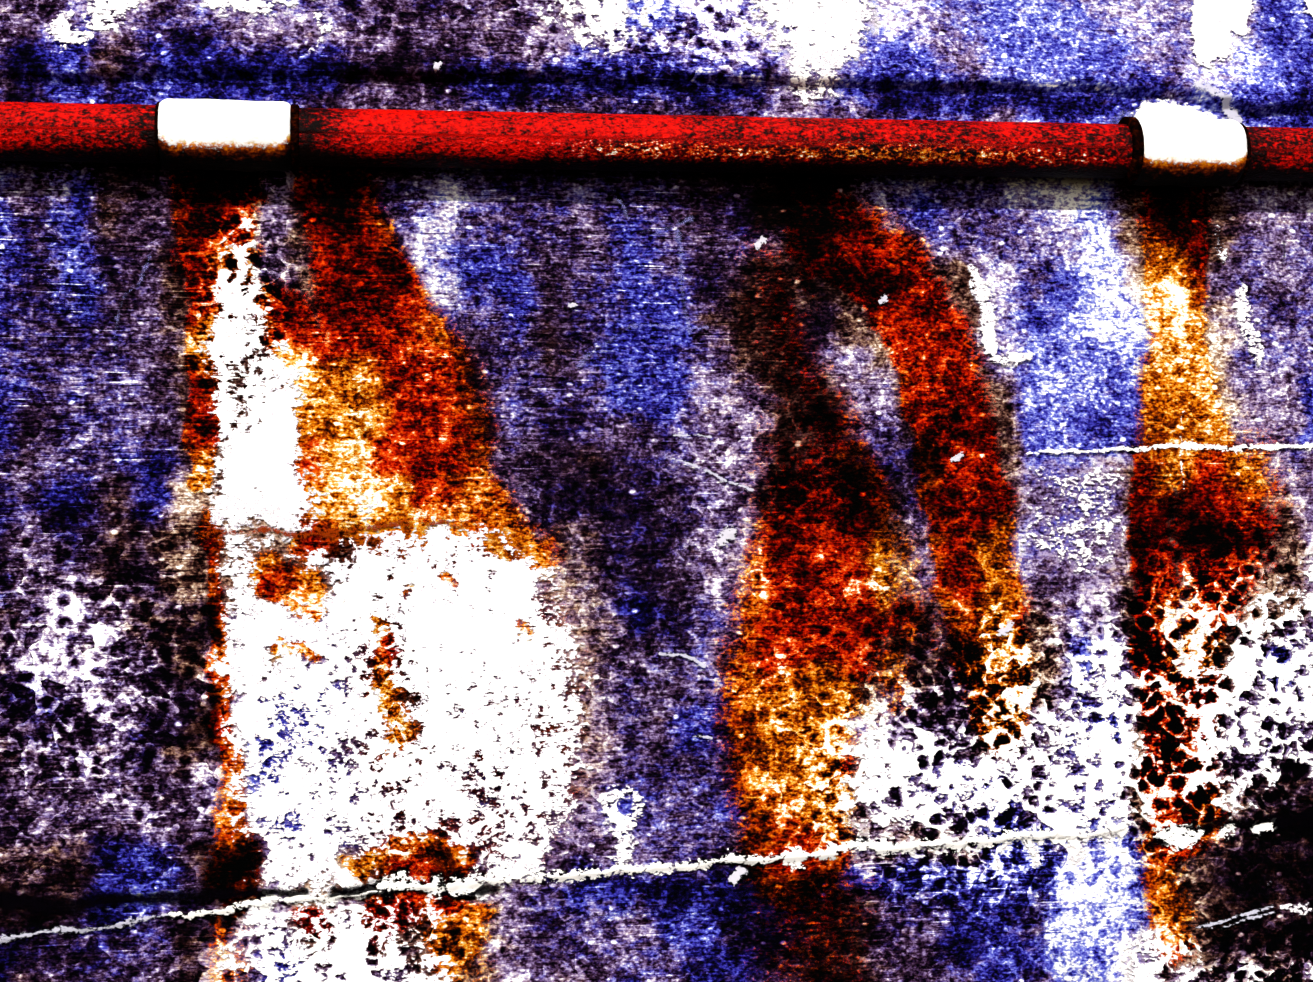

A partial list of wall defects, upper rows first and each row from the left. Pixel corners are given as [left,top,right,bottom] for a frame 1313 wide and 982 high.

crack [0,879,501,916]
corrosion [168,166,588,982]
peeling [182,210,613,982]
corrosion [713,173,1039,982]
peeling [815,458,1313,871]
crack [1026,411,1313,489]
corrosion [1126,185,1293,972]